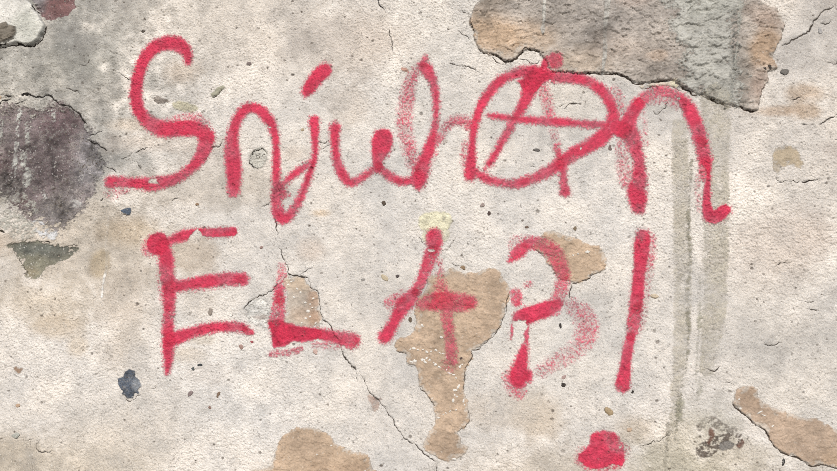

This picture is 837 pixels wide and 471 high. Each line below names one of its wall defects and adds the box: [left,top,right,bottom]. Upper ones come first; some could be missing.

flaking render [32,0,76,21]
peeling [469,0,785,113]
leakage [0,109,57,240]
flaking render [0,96,106,234]
crack [0,88,150,185]
spalling [7,240,79,279]
peeling [282,275,322,329]
crack [244,191,437,471]
peeling [394,267,510,462]
peeling [533,231,607,284]
peeling [252,427,376,471]
peeling [732,386,837,469]